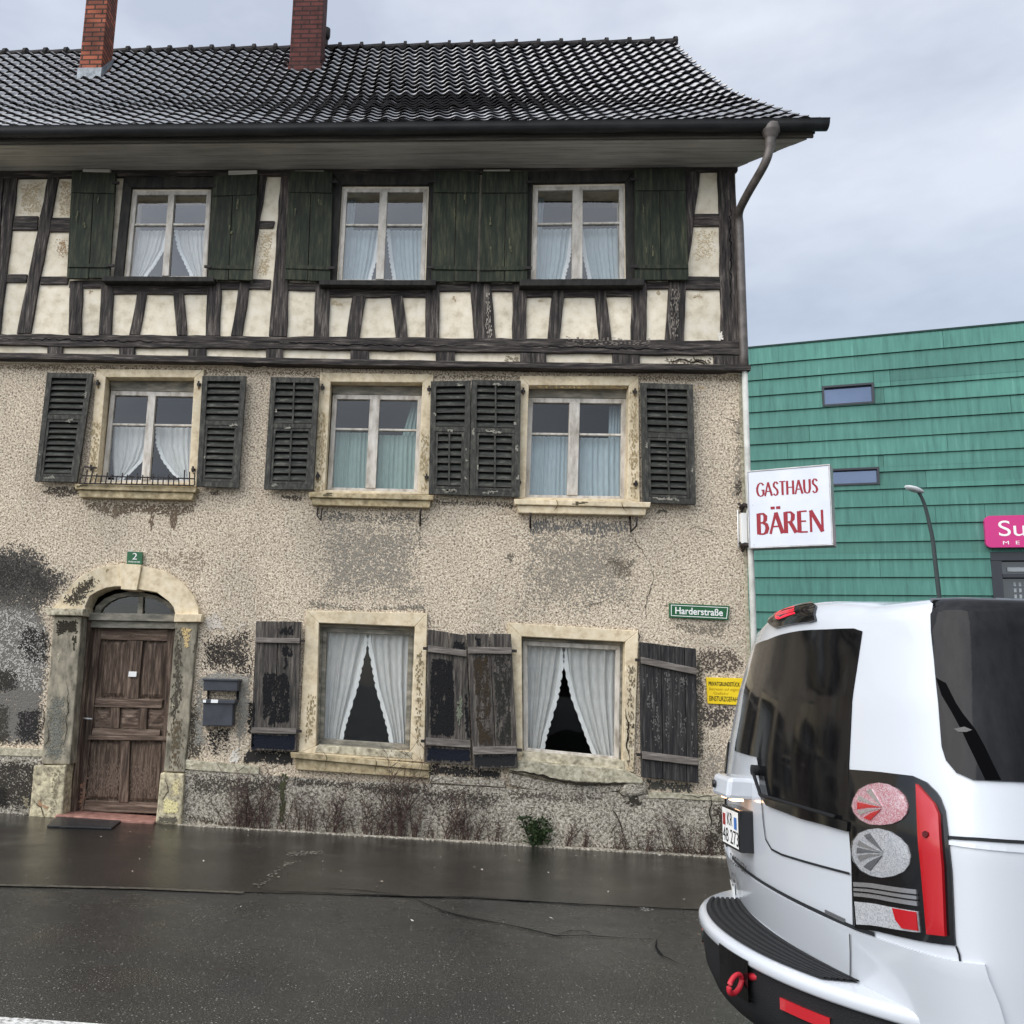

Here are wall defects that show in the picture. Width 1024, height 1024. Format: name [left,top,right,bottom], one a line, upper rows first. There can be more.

damp [43,422,196,530]
damp [0,540,100,665]
damp [0,669,43,746]
damp [167,627,253,771]